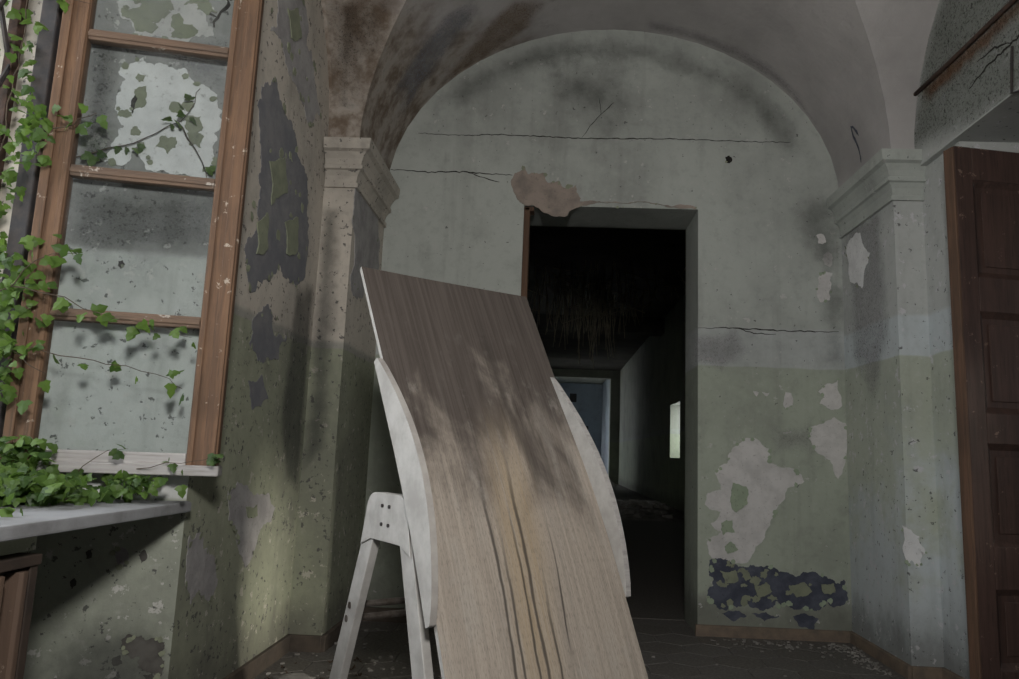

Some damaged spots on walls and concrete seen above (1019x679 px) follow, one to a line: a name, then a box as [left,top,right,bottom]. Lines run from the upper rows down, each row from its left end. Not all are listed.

peeling [270,0,322,128]
crack [969,34,1019,89]
peeling [245,77,309,293]
spalling [511,166,697,217]
peeling [816,234,833,303]
peeling [845,233,870,289]
peeling [248,304,288,410]
peeling [808,378,847,478]
peeling [705,437,848,629]